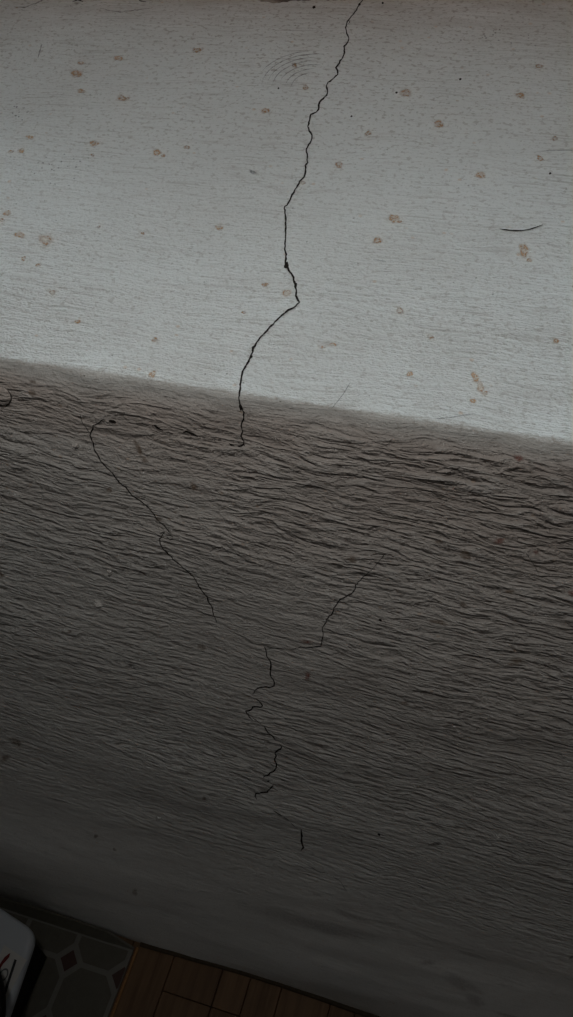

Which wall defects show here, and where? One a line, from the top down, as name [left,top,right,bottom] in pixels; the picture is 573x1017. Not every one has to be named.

crack [80,0,363,620]
crack [245,554,385,891]